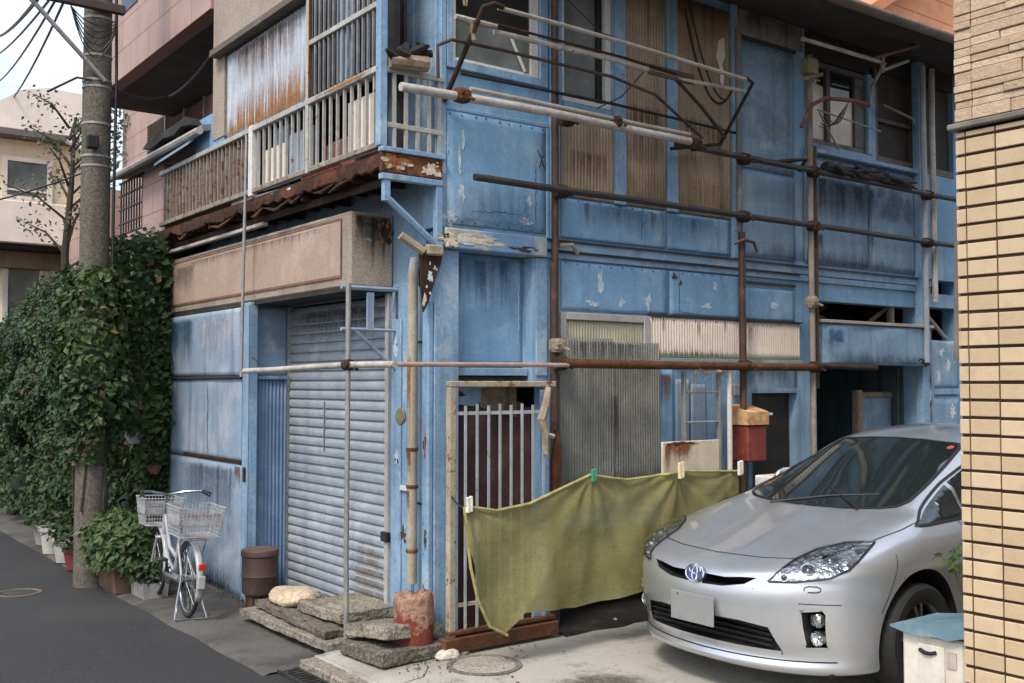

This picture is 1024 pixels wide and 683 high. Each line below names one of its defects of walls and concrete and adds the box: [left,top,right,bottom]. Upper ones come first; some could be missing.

rust [229,75,305,136]
peeling [381,129,538,253]
damp [357,215,390,254]
rust [379,220,394,245]
peeling [422,261,438,306]
damp [171,320,226,347]
rust [665,444,690,460]